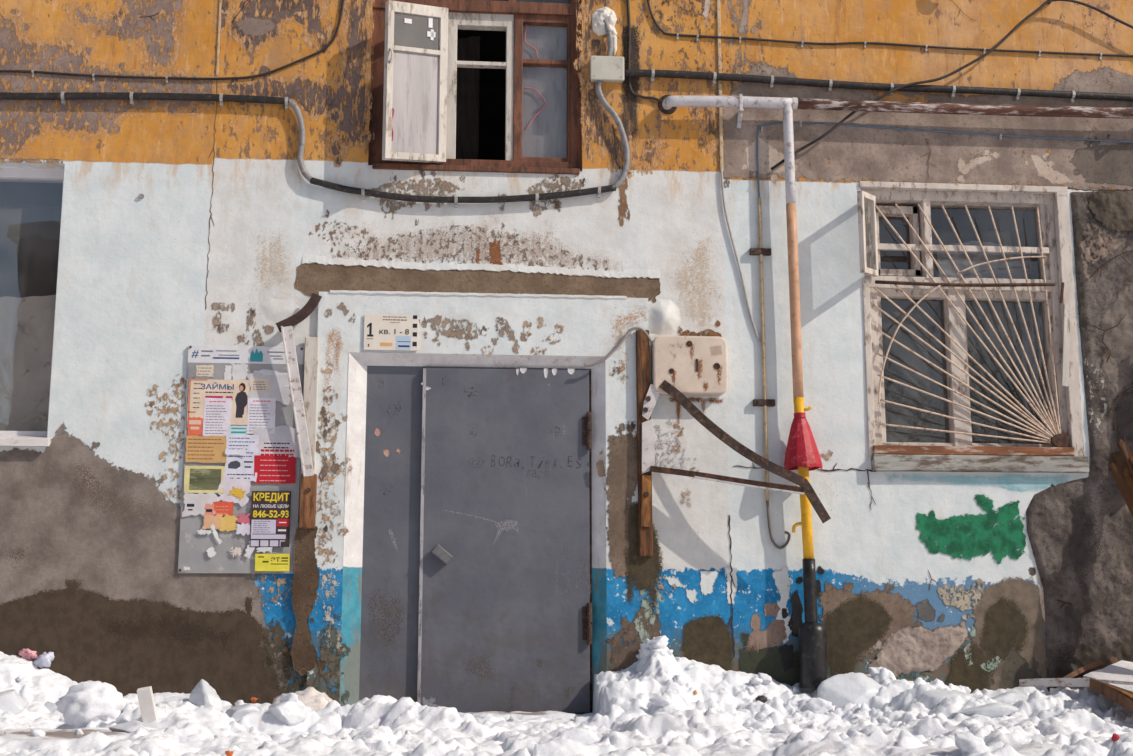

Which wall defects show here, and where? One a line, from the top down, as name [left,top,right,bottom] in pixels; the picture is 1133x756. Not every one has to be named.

peeling [0,0,375,167]
peeling [527,0,665,218]
peeling [211,302,274,346]
spalling [294,170,661,323]
peeling [419,315,575,378]
spalling [646,0,1133,691]
peeling [0,362,353,705]
spalling [605,540,738,672]